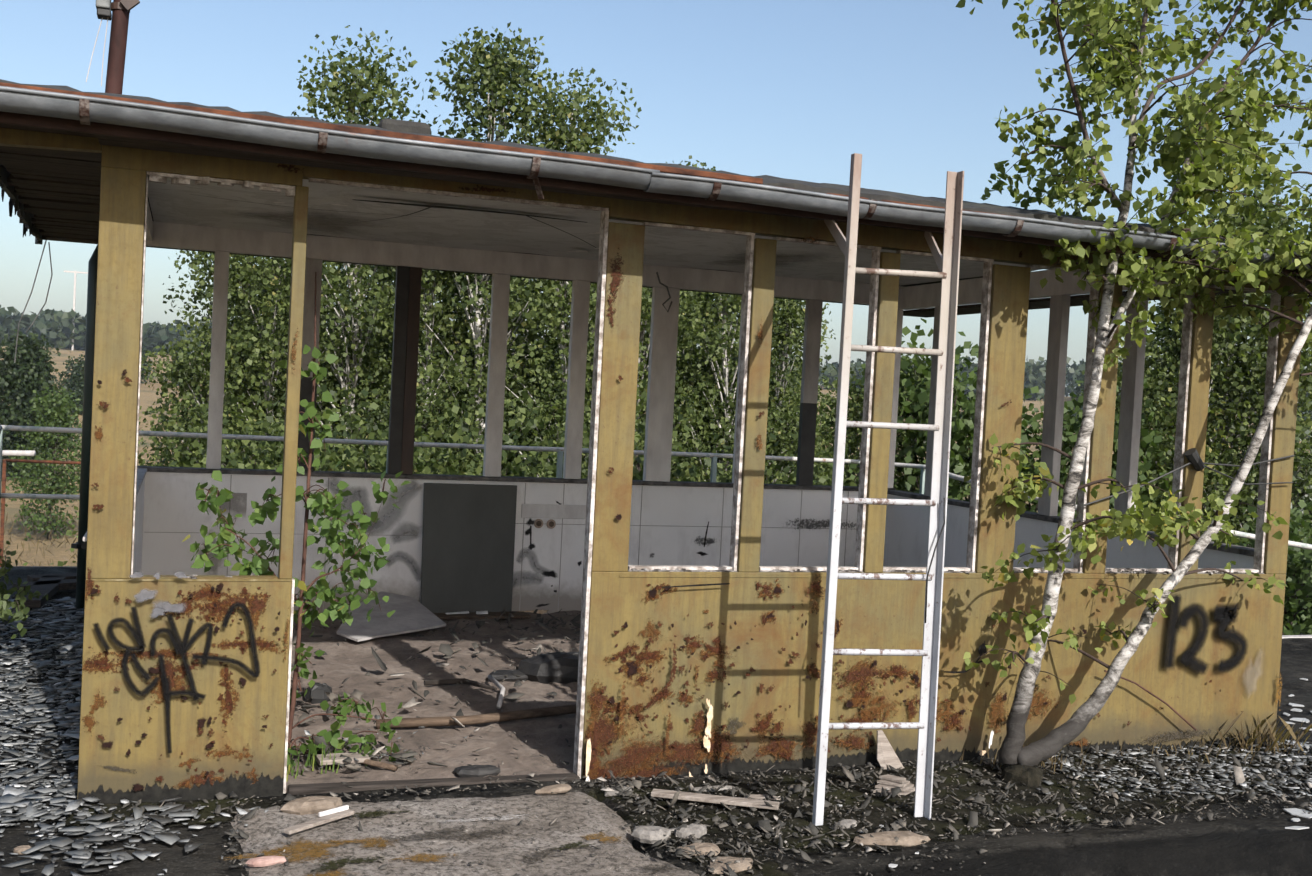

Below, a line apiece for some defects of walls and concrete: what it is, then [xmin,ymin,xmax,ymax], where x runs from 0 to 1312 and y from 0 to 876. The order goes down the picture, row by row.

rust [607,253,624,327]
rust [85,569,132,606]
rust [82,583,290,789]
rust [376,574,921,780]
peeling [689,698,713,777]
rust [936,682,1011,742]
rust [1027,675,1061,722]